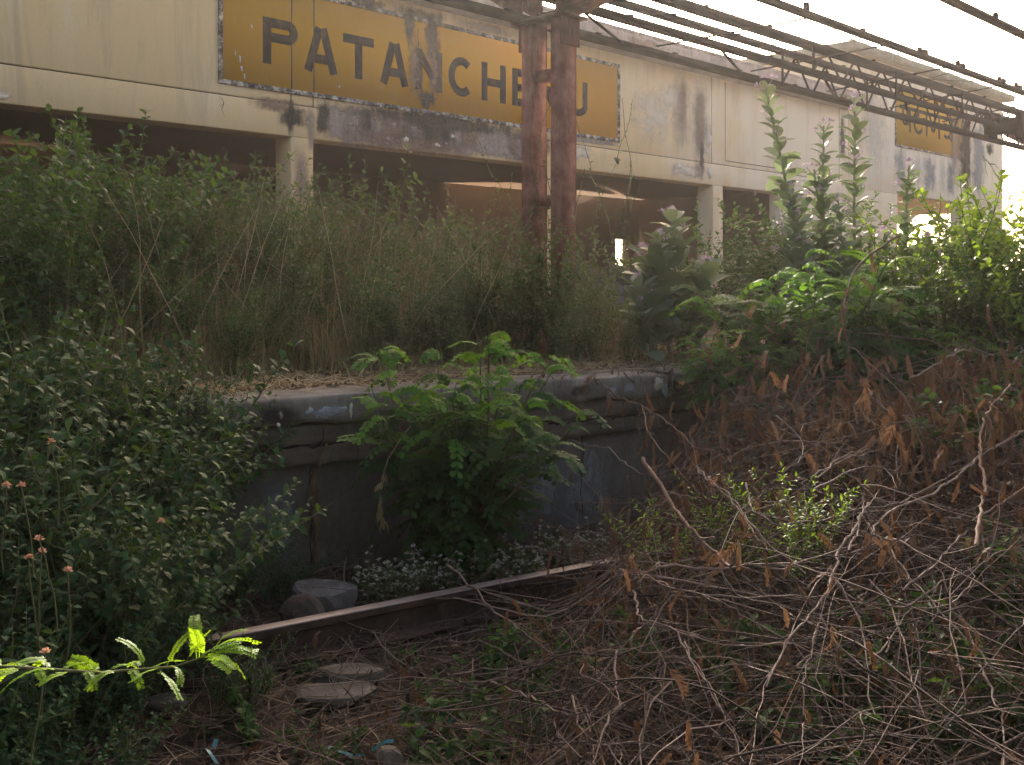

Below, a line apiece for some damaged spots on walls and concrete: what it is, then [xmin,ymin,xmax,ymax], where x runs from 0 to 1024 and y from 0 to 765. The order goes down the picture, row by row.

leakage [398,6,442,109]
leakage [677,87,707,171]
leakage [925,159,935,187]
leakage [948,110,993,191]
crack [239,425,384,454]